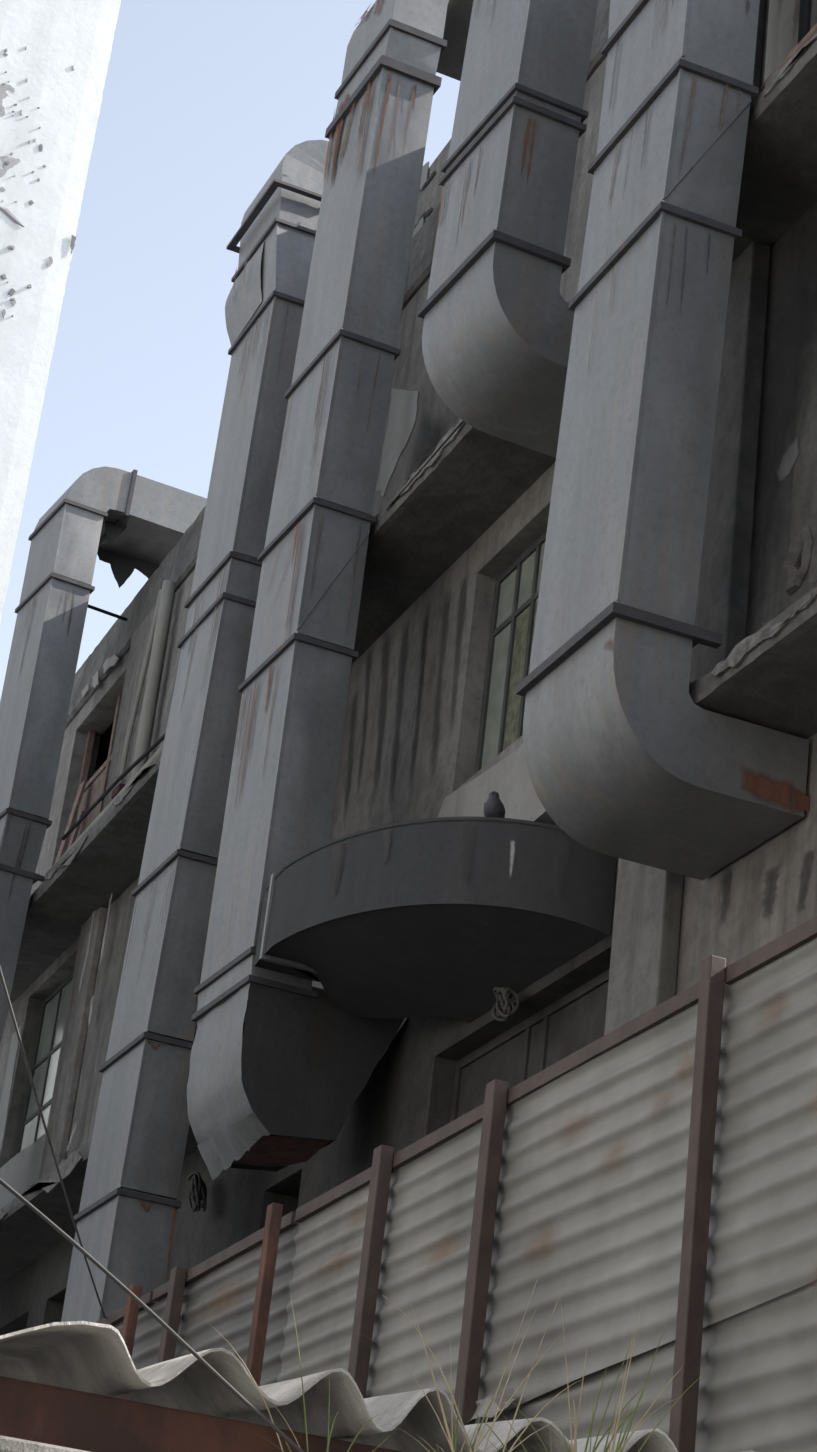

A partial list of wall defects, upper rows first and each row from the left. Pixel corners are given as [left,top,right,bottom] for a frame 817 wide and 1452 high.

peeling [0,49,47,205]
rust [324,73,417,182]
peeling [0,274,32,318]
peeling [776,437,800,483]
spalling [709,588,817,676]
rust [235,665,278,802]
rust [743,770,810,811]
leakage [764,869,777,914]
leakage [799,852,812,906]